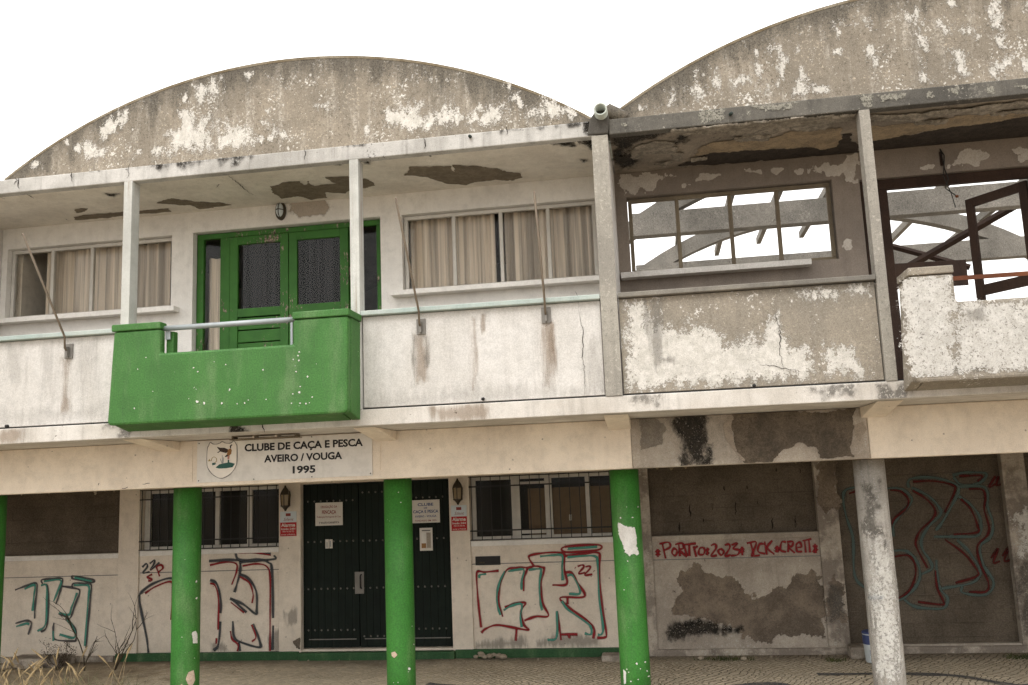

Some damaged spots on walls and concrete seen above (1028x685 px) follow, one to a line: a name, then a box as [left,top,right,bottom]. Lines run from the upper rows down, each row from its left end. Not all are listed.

peeling [663,42,831,108]
leakage [177,155,252,168]
flaking render [270,176,349,217]
flaking render [404,165,522,185]
flaking render [617,113,860,196]
flaking render [870,100,1028,170]
peeling [620,298,875,393]
peeling [896,275,1028,378]
leakage [672,416,712,466]
spalling [723,408,867,514]
spalling [618,506,639,562]
flaking render [671,559,849,644]